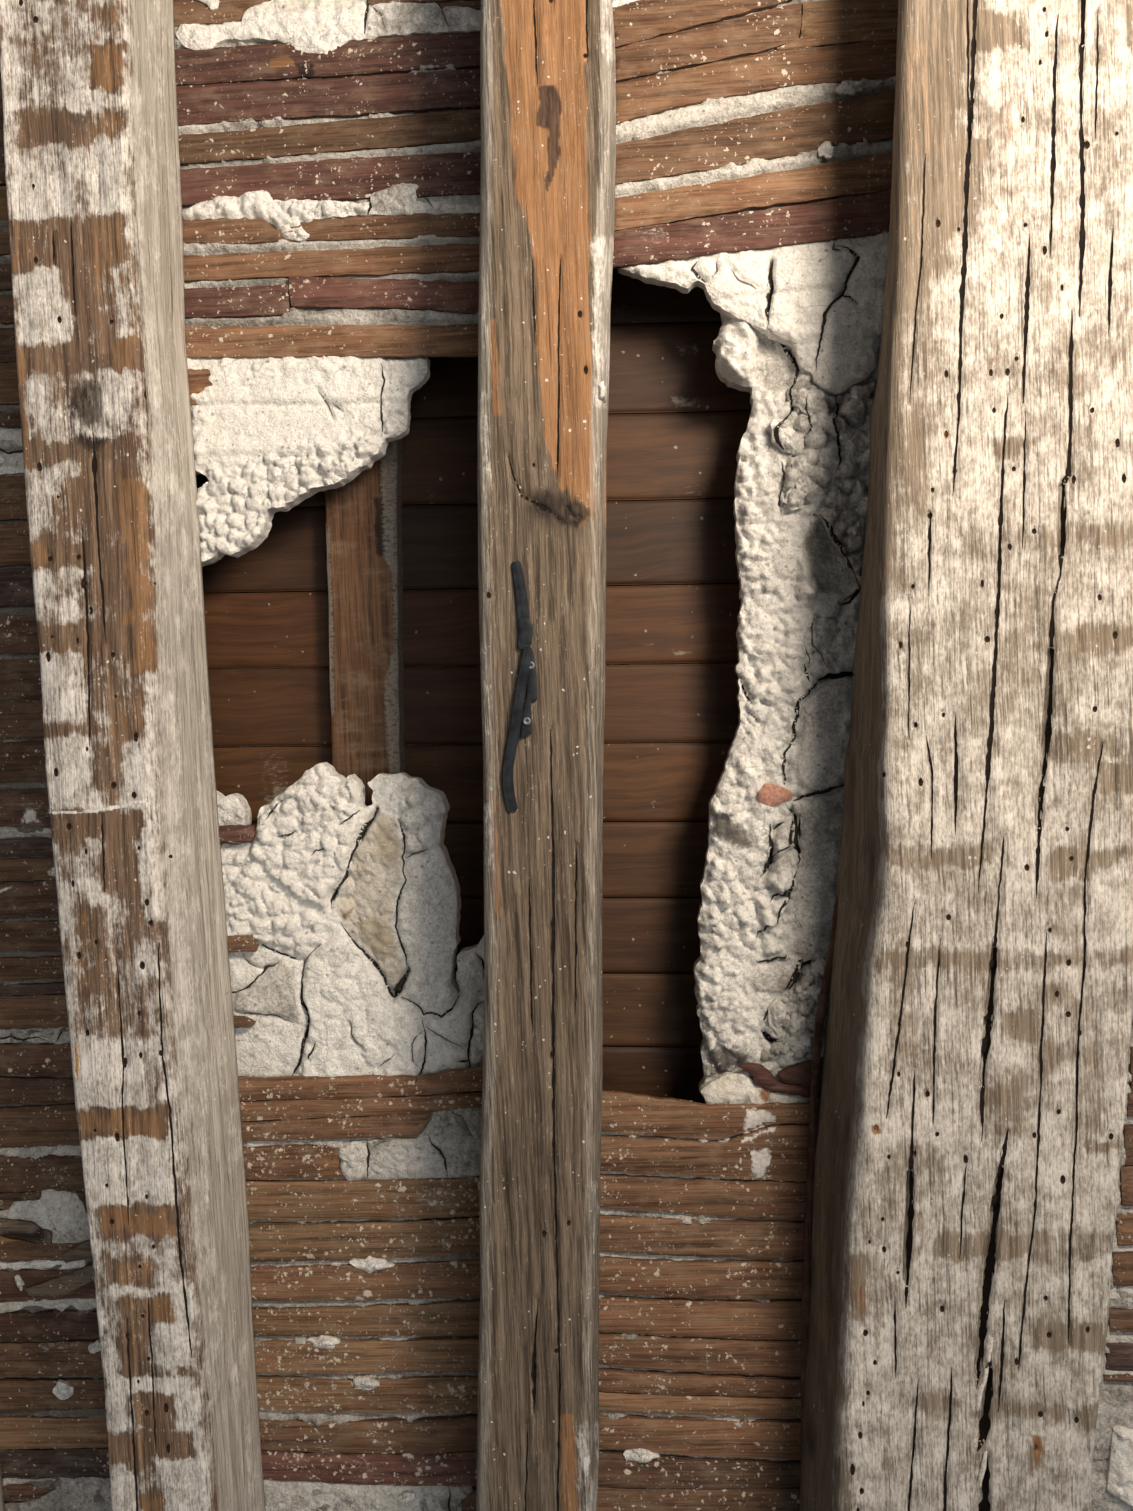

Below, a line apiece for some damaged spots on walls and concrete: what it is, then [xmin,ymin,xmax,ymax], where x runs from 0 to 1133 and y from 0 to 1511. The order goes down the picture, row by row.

crack [364,0,386,34]
crack [531,0,539,86]
crack [583,0,591,55]
crack [691,241,860,506]
spalling [758,783,793,807]
crack [740,515,861,1043]
crack [886,0,1114,1511]
crack [227,799,484,1083]
flaking render [760,958,828,1061]
flaking render [701,1071,810,1105]